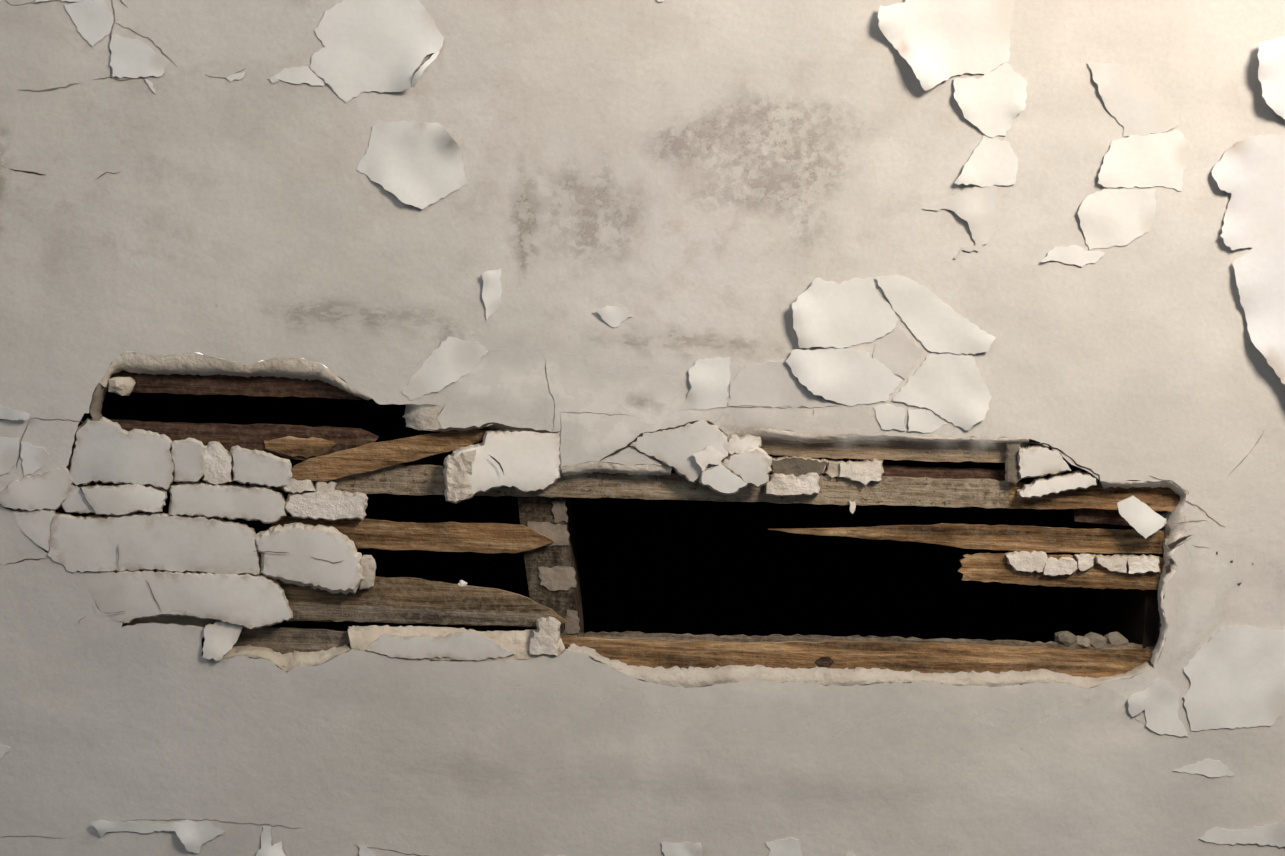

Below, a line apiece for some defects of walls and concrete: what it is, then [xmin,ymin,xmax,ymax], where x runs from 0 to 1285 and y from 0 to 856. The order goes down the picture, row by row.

crack [25,0,175,92]
peeling [269,0,444,103]
peeling [357,121,467,209]
peeling [878,0,1027,259]
peeling [1041,62,1192,267]
peeling [1211,36,1285,384]
flaking render [90,352,372,421]
peeling [679,275,1029,444]
flaking render [122,615,217,627]
peeling [219,481,1285,737]
crack [2,832,53,840]
crack [127,818,290,828]